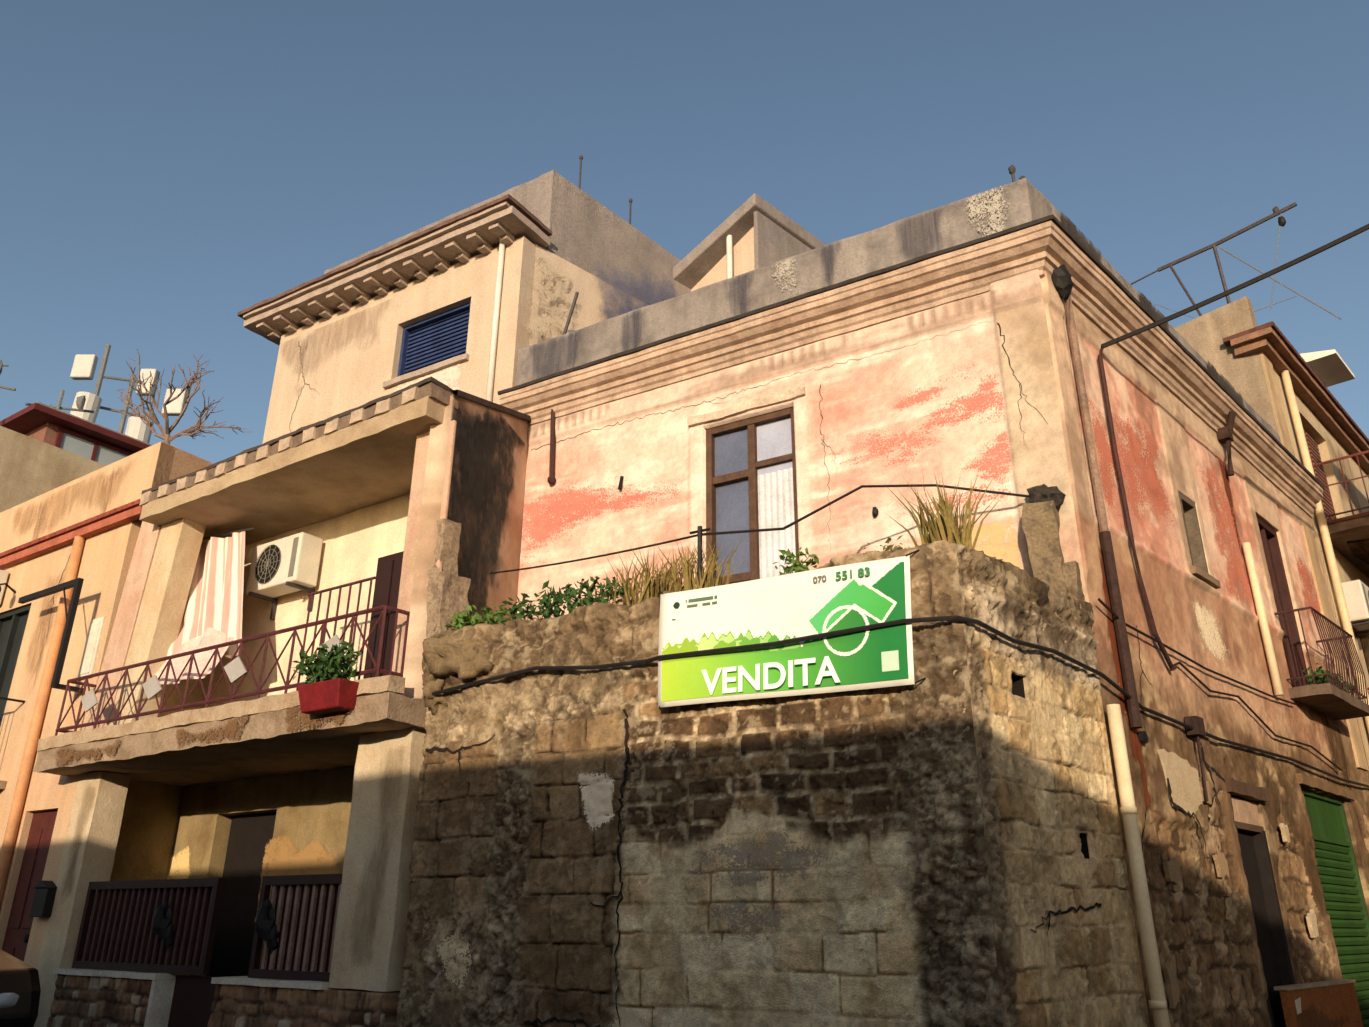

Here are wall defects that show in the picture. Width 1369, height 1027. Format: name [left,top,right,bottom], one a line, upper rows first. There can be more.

crack [289,342,316,433]
water stain [519,247,580,376]
water stain [447,403,684,621]
water stain [601,271,673,350]
crack [533,322,1048,552]
water stain [1061,213,1102,262]
rust [1099,549,1150,810]
flaking render [254,835,340,922]
crack [524,709,630,1027]
crack [1031,902,1102,936]
spalling [1142,749,1266,1027]
spalling [1276,811,1336,983]